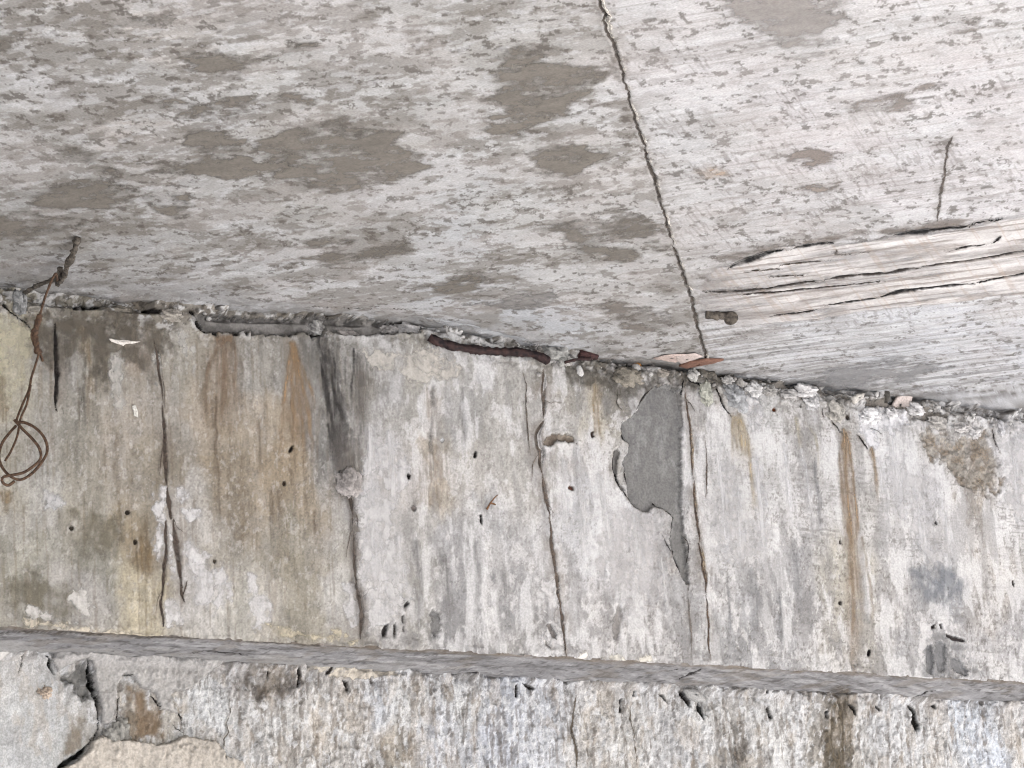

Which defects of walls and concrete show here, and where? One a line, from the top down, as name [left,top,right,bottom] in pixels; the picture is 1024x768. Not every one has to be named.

water stain [159,117,432,194]
water stain [485,45,608,136]
crack [598,0,1024,358]
crack [154,341,187,627]
water stain [152,486,233,609]
water stain [247,335,462,646]
spalling [189,311,551,365]
crack [523,369,567,657]
spalling [612,384,689,585]
crack [612,379,731,680]
corrosion [839,428,859,596]
spalling [817,391,913,420]